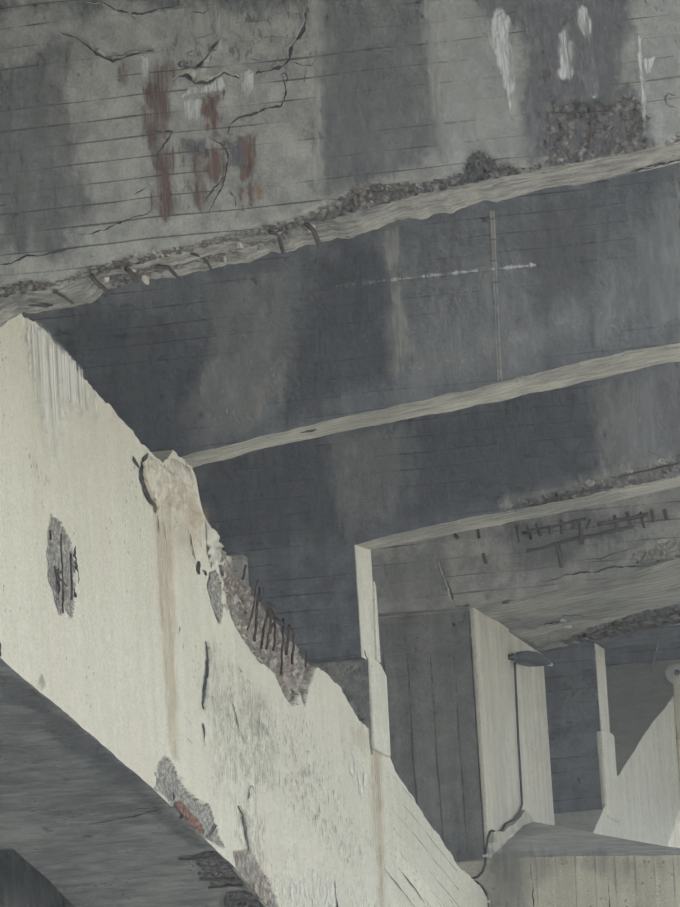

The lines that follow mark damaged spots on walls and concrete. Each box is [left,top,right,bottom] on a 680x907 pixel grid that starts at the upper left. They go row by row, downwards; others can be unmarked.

crack [61,32,154,63]
corrosion [142,65,261,222]
crack [86,0,322,212]
spalling [0,95,680,304]
water stain [475,0,655,164]
spalling [46,514,80,617]
crack [133,453,187,543]
crack [190,533,207,576]
spalling [207,547,316,705]
spalling [507,457,680,509]
spalling [555,604,680,647]
spalling [154,756,278,907]